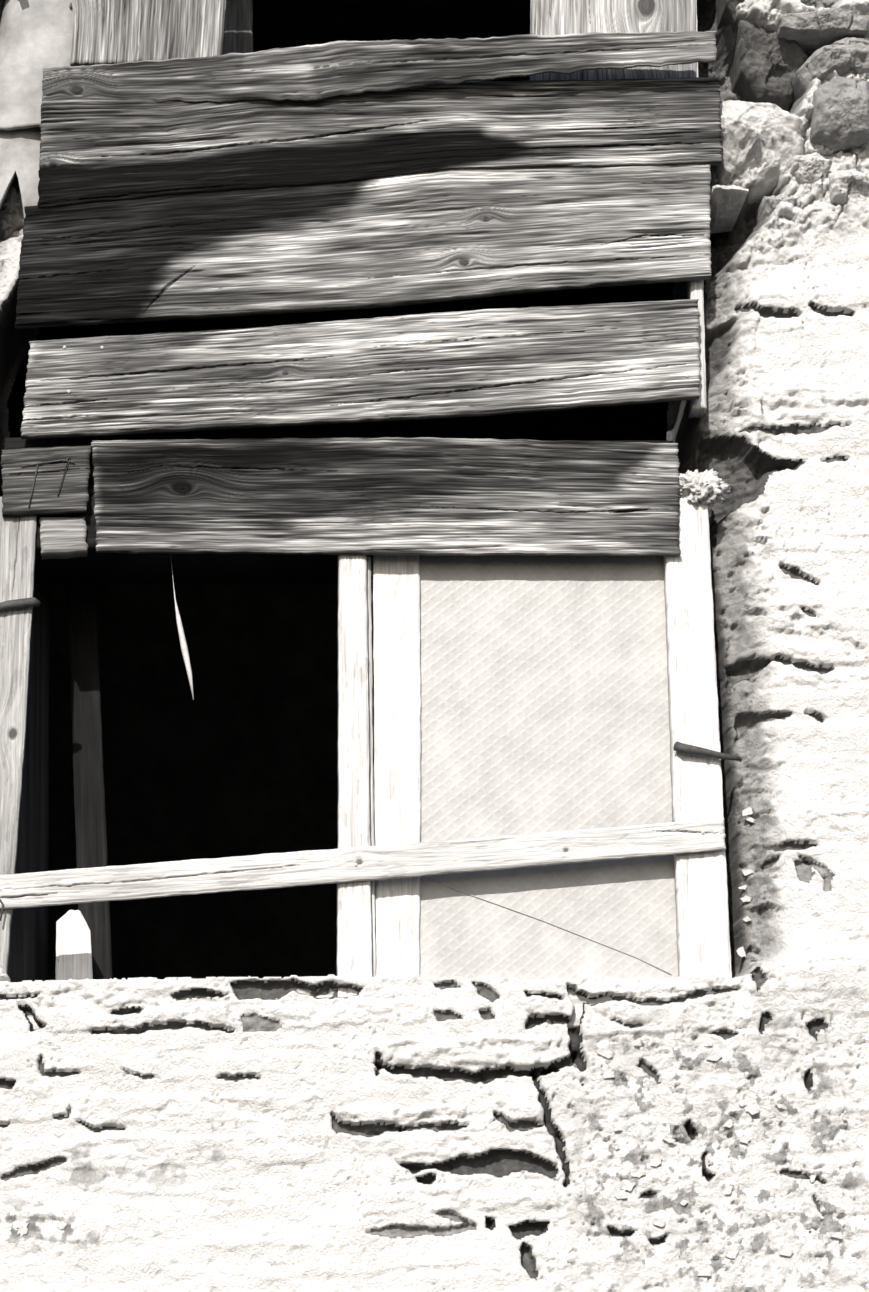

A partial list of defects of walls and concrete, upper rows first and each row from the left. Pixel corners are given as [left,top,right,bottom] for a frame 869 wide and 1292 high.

crack [532,985,738,1187]